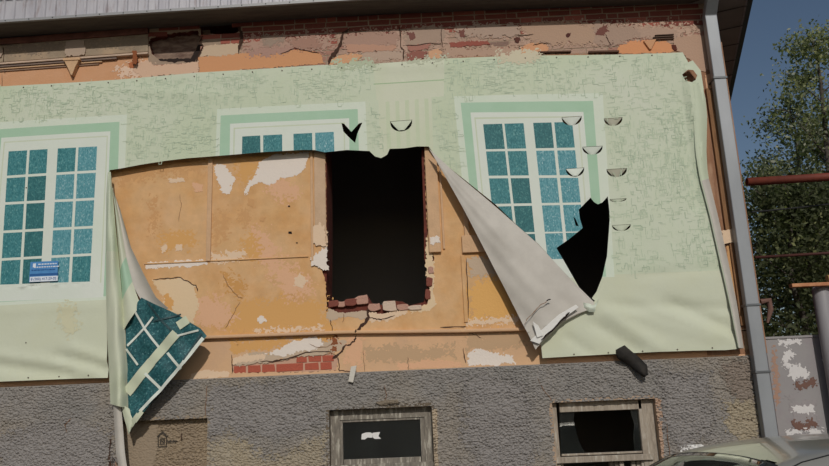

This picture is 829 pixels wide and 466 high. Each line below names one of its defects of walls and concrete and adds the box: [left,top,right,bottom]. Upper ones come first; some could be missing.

crack [280,28,350,64]
peeling [111,3,712,88]
peeling [214,164,236,194]
peeling [244,152,310,195]
crack [153,277,198,291]
flaking render [188,235,440,379]
crack [261,309,395,372]
peeling [397,348,516,370]